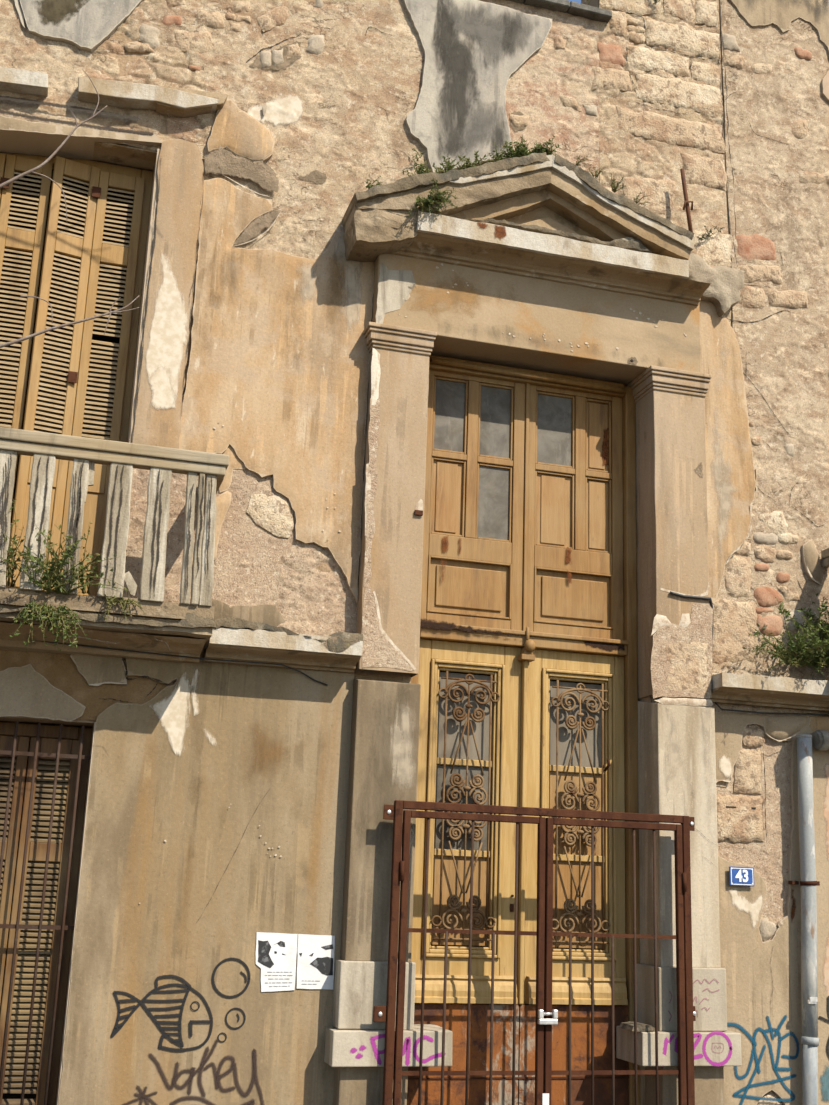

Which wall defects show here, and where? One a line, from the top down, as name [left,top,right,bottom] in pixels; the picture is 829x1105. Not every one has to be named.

peeling [0,0,442,324]
damp [437,0,530,153]
crack [182,174,204,405]
peeling [479,0,829,716]
peeling [0,348,416,671]
spalling [414,499,423,517]
peeling [0,649,176,720]
peeling [716,724,792,942]